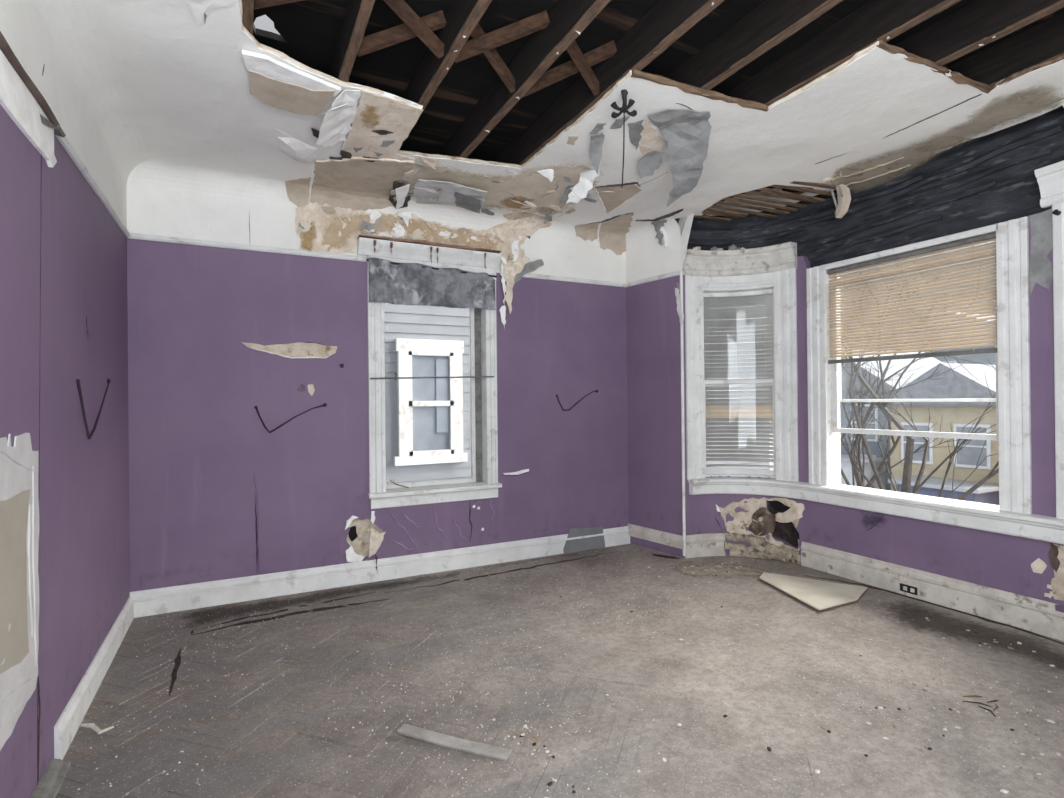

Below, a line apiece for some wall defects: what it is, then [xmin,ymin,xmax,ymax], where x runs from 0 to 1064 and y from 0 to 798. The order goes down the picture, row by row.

flaking render [242,50,361,159]
peeling [567,103,711,206]
water stain [823,155,911,186]
flaking render [676,106,1064,268]
flaking render [295,179,545,254]
peeling [675,282,684,326]
peeling [242,342,344,368]
flaking render [345,511,386,569]
flaking render [715,497,805,551]
peeling [1031,558,1047,574]